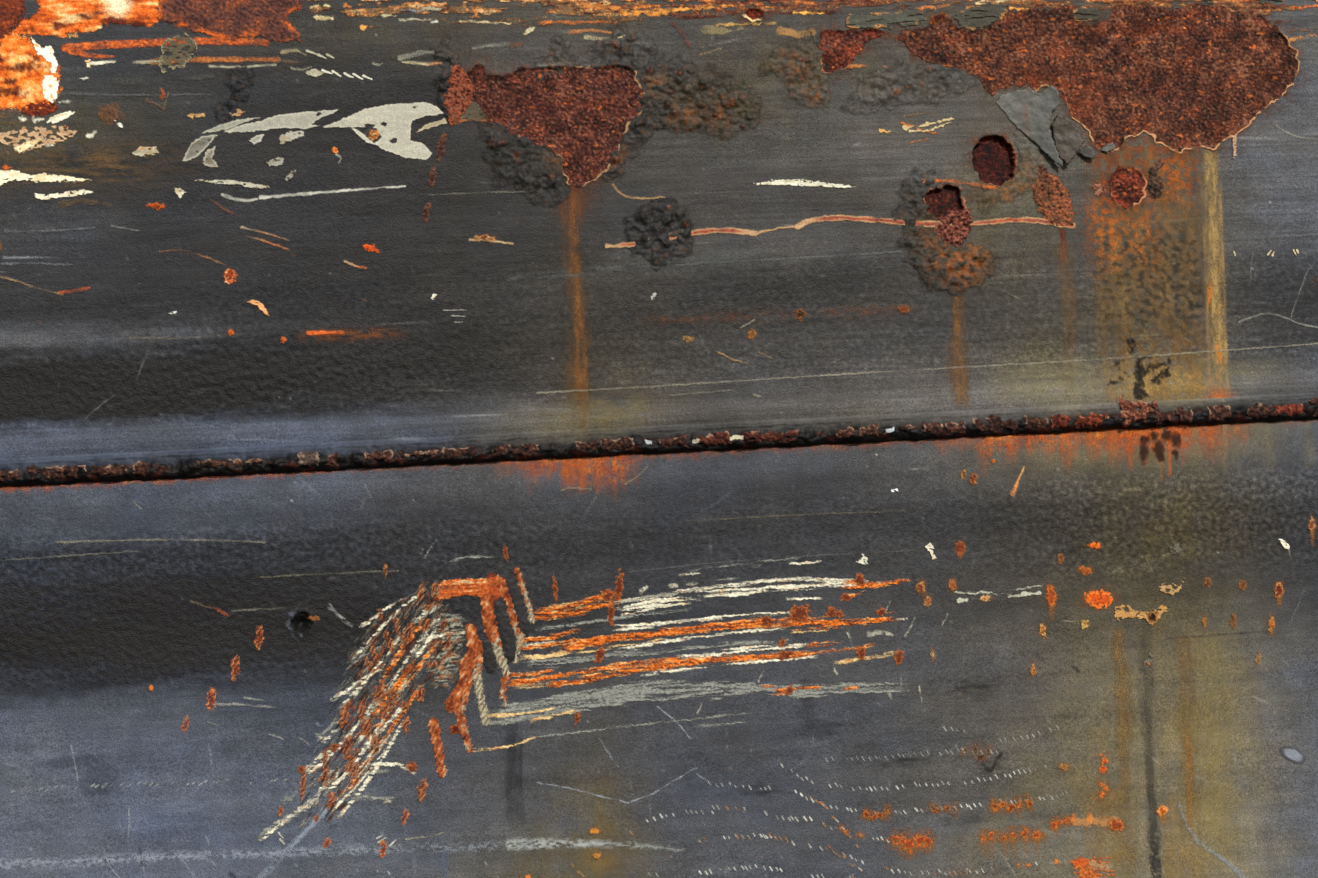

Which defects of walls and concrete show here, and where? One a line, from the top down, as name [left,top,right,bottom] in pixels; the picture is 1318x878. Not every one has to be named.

peeling [0,111,77,154]
peeling [0,170,92,200]
peeling [174,135,269,198]
peeling [249,131,304,181]
peeling [995,85,1116,167]
corrosion [0,0,1318,463]
corrosion [0,461,149,487]
corrosion [363,436,635,474]
corrosion [511,569,931,687]
corrosion [298,583,451,822]
corrosion [980,814,1124,843]
damp [1150,822,1161,878]